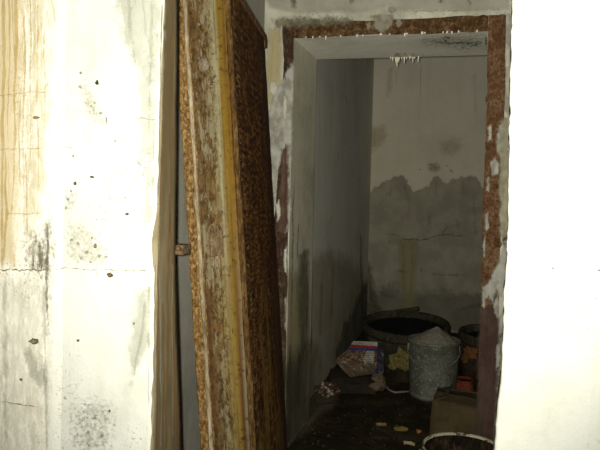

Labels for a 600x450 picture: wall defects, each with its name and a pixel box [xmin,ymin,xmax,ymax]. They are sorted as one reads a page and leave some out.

peeling [268,62,294,232]
damp [283,163,484,449]
peeling [482,15,511,335]